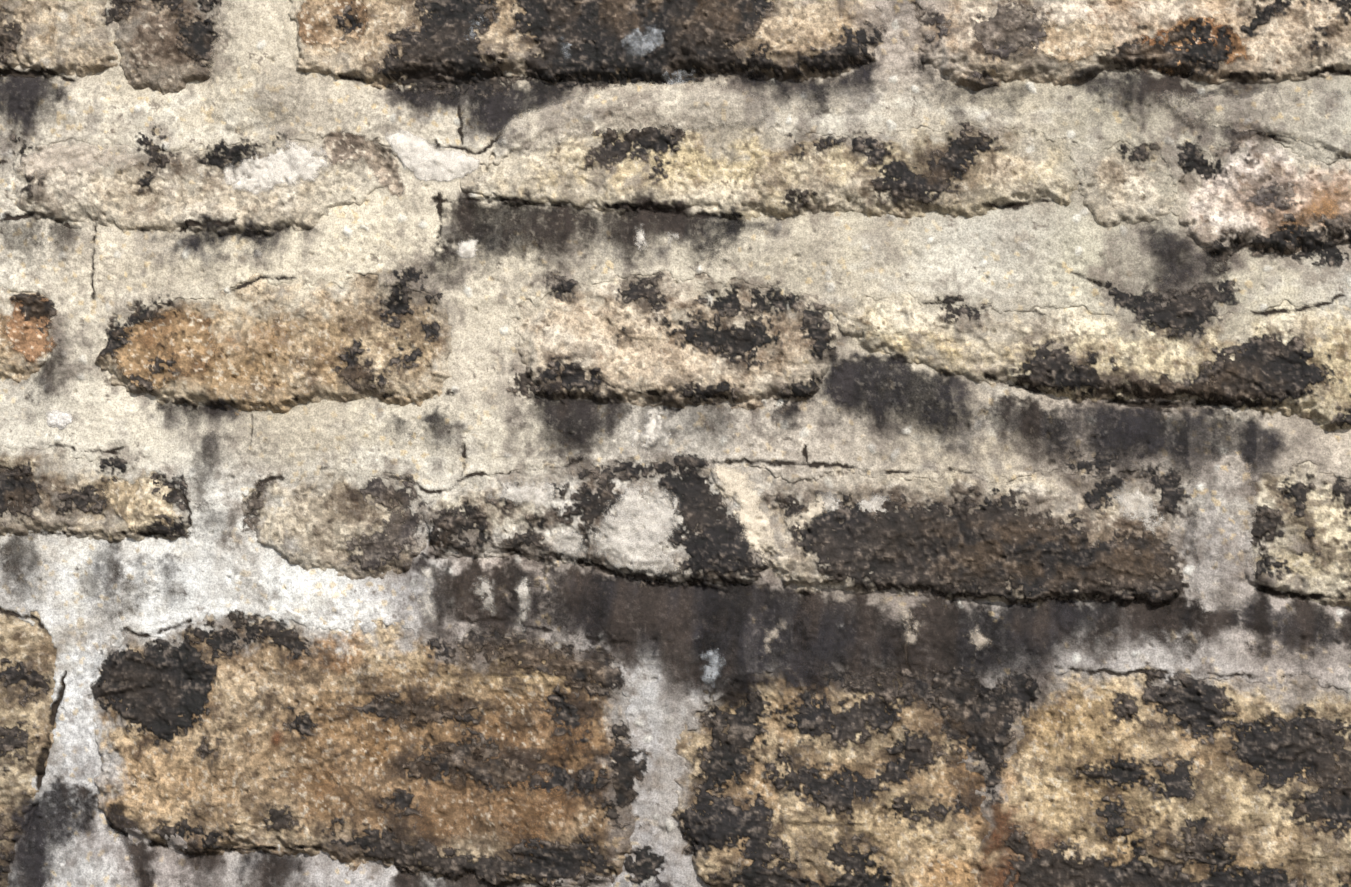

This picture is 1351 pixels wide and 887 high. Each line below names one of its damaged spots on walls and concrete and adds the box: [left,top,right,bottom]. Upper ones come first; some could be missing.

leakage [629,27,660,55]
leakage [389,72,585,139]
leakage [772,402,798,427]
leakage [812,352,1282,473]
leakage [403,465,1351,705]
crack [36,671,67,790]